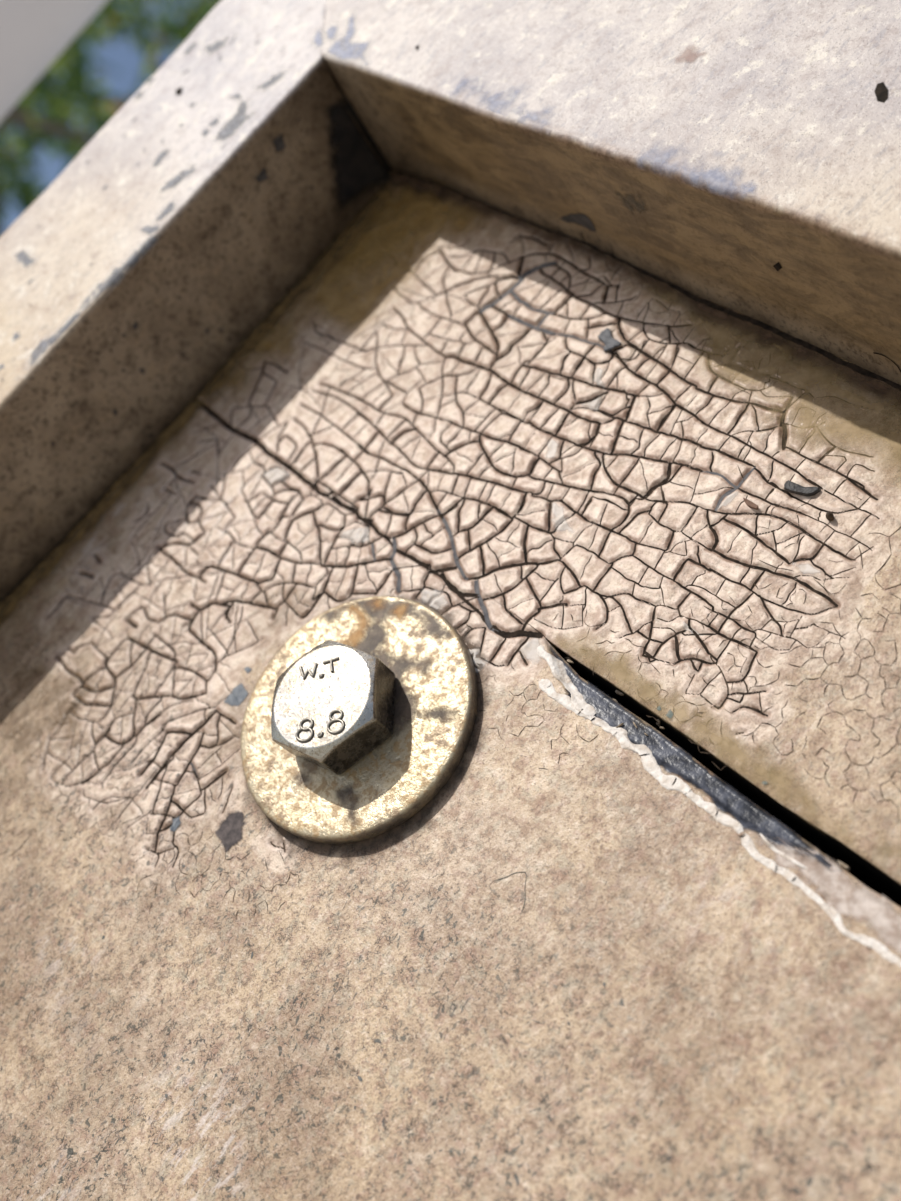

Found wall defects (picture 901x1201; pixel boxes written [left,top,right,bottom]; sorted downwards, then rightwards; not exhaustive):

corrosion [342,600,406,646]